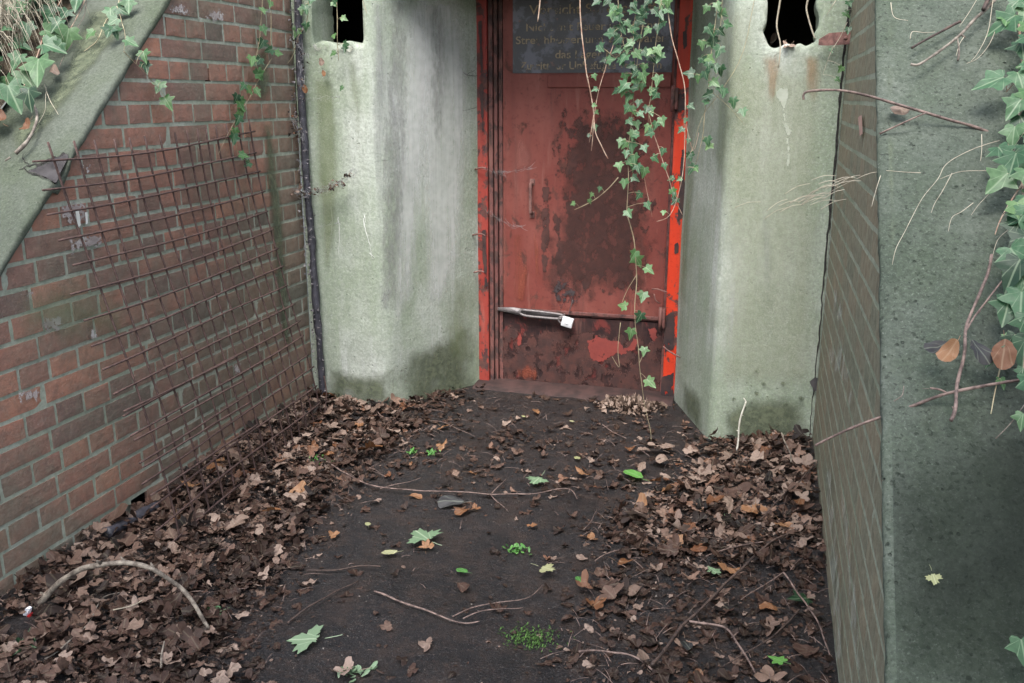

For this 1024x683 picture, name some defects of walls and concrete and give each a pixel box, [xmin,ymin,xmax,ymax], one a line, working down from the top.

damp [776,88,792,166]
corrosion [541,109,660,304]
corrosion [499,325,662,392]
peeling [587,312,675,362]
spalling [660,373,674,397]